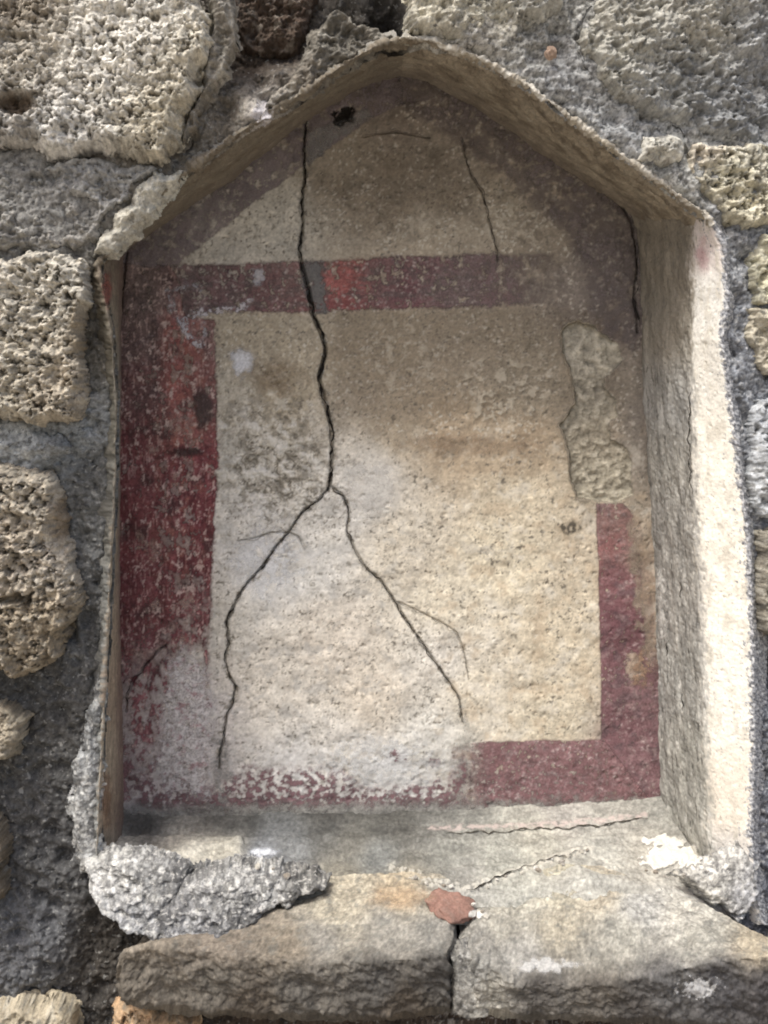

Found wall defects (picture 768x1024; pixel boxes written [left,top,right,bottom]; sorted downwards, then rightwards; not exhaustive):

crack [462,139,498,262]
crack [217,121,469,769]
flaking render [557,319,633,503]
crack [446,817,648,890]